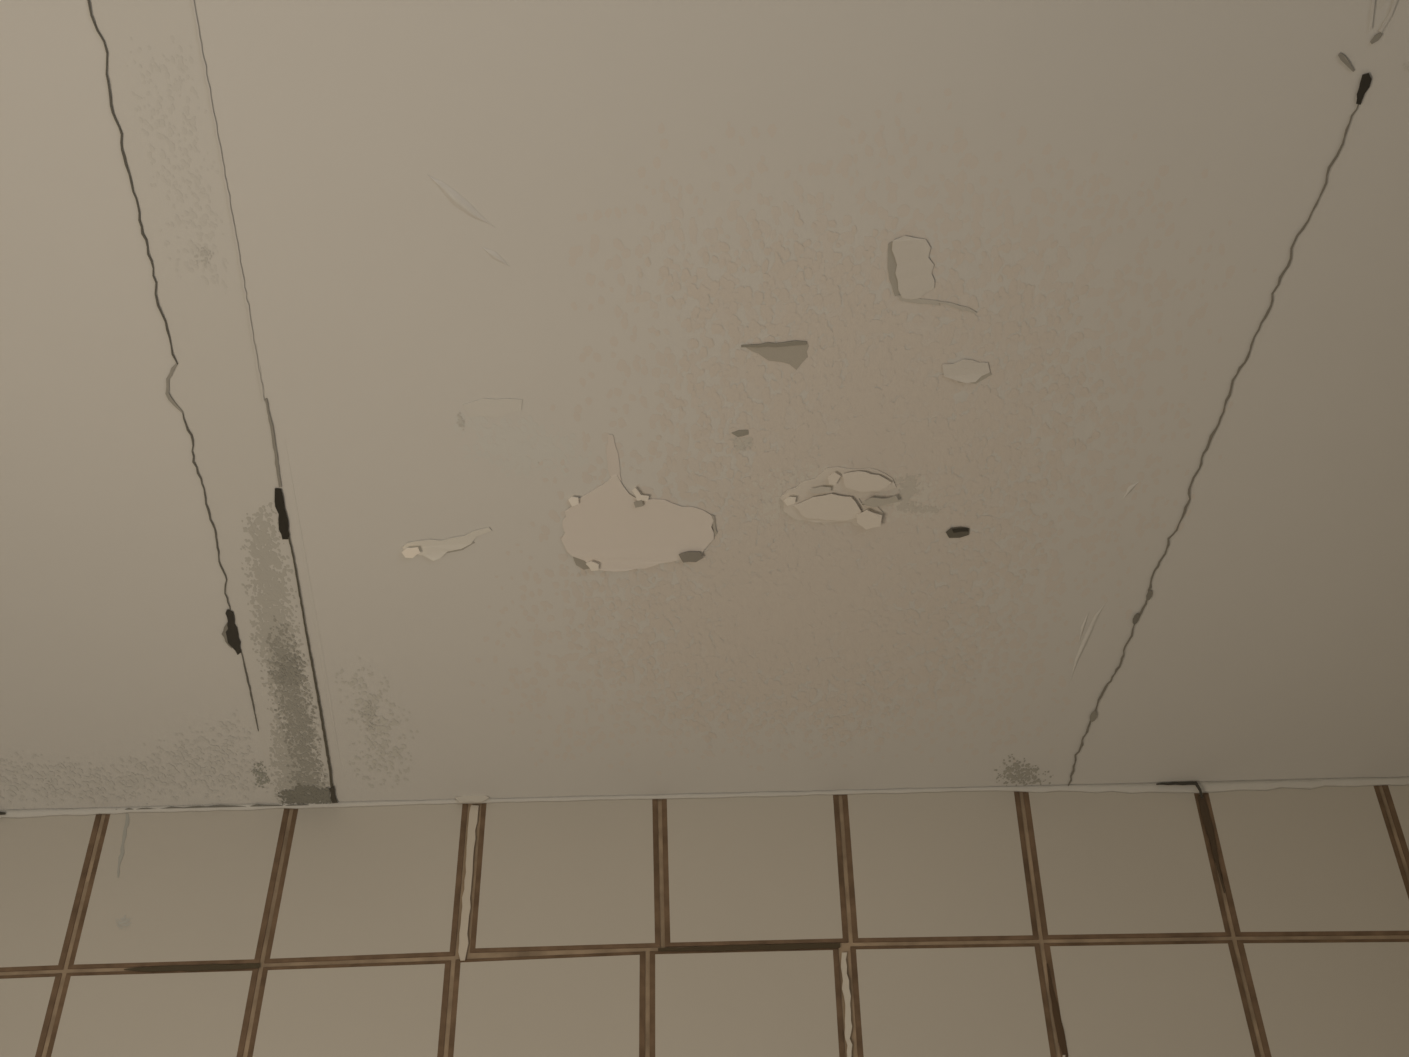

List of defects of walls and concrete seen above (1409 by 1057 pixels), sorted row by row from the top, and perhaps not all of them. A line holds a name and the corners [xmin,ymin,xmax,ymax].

crack [87,0,231,611]
flaking render [746,341,809,370]
crack [1068,32,1382,786]
peeling [402,527,492,561]
peeling [561,475,717,572]
peeling [780,467,899,530]
water stain [0,502,338,878]